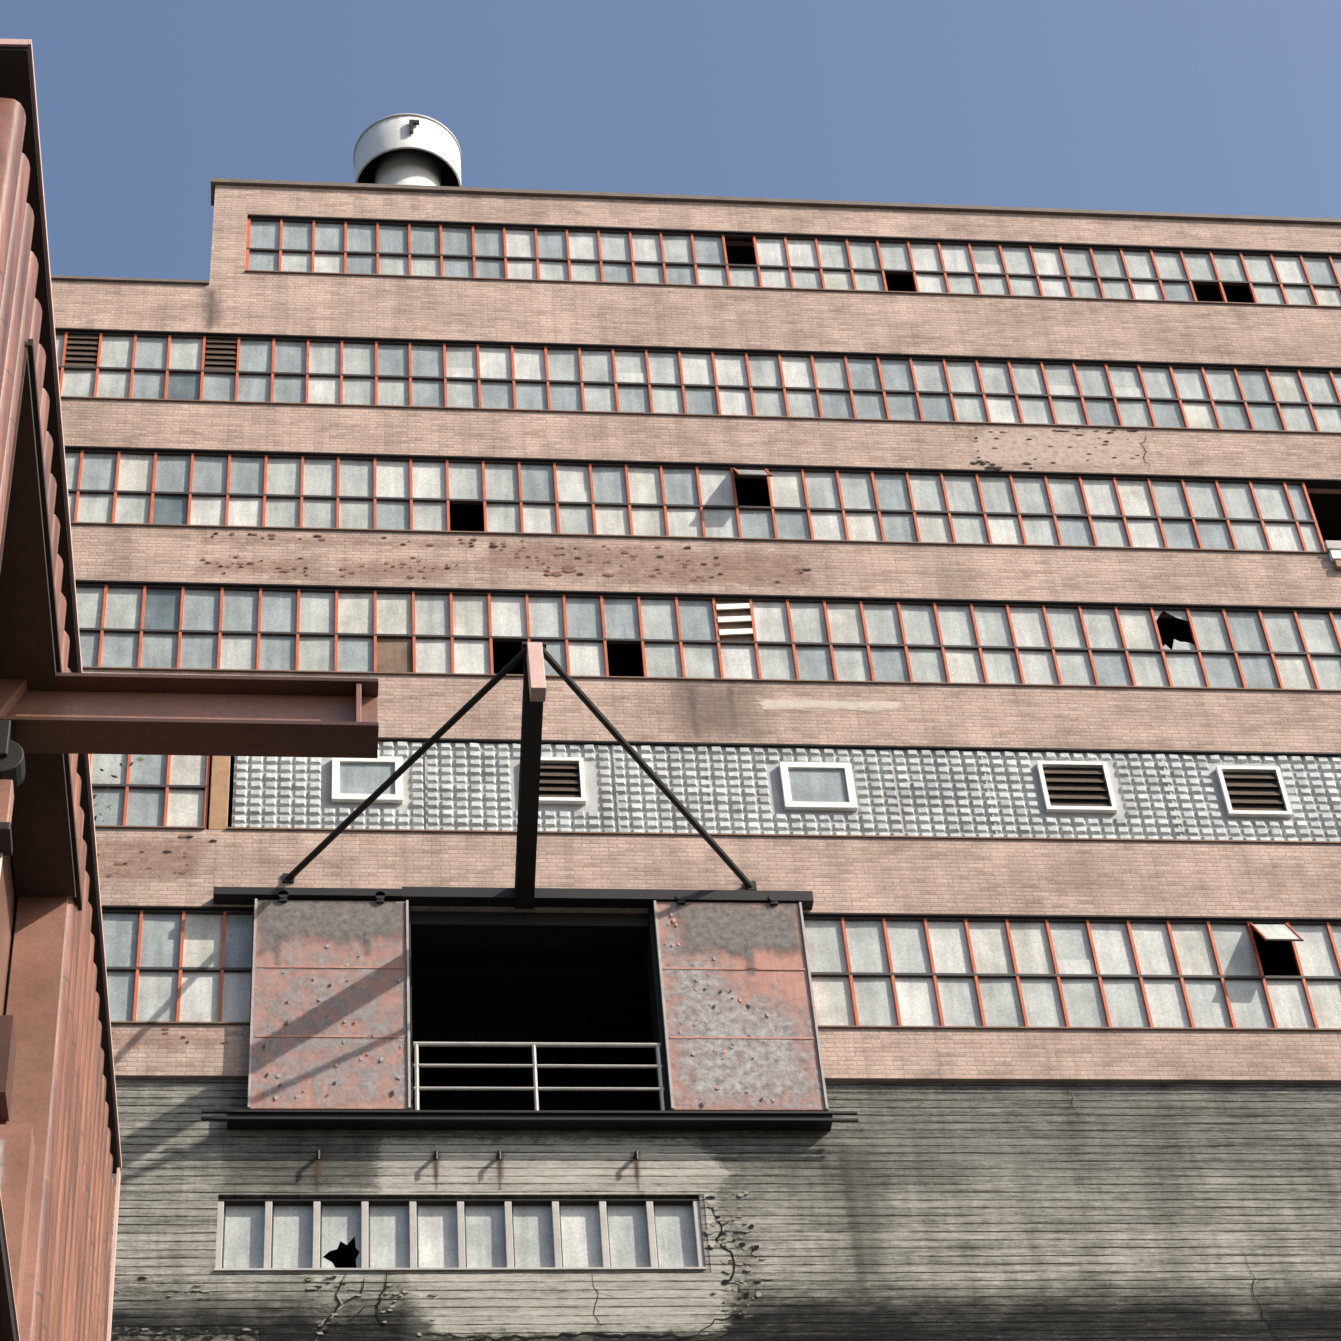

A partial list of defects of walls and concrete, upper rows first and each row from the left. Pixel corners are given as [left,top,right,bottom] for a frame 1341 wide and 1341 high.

spalling [969,427,1145,470]
spalling [201,555,308,576]
crack [314,1201,751,1341]
spalling [105,1328,268,1341]